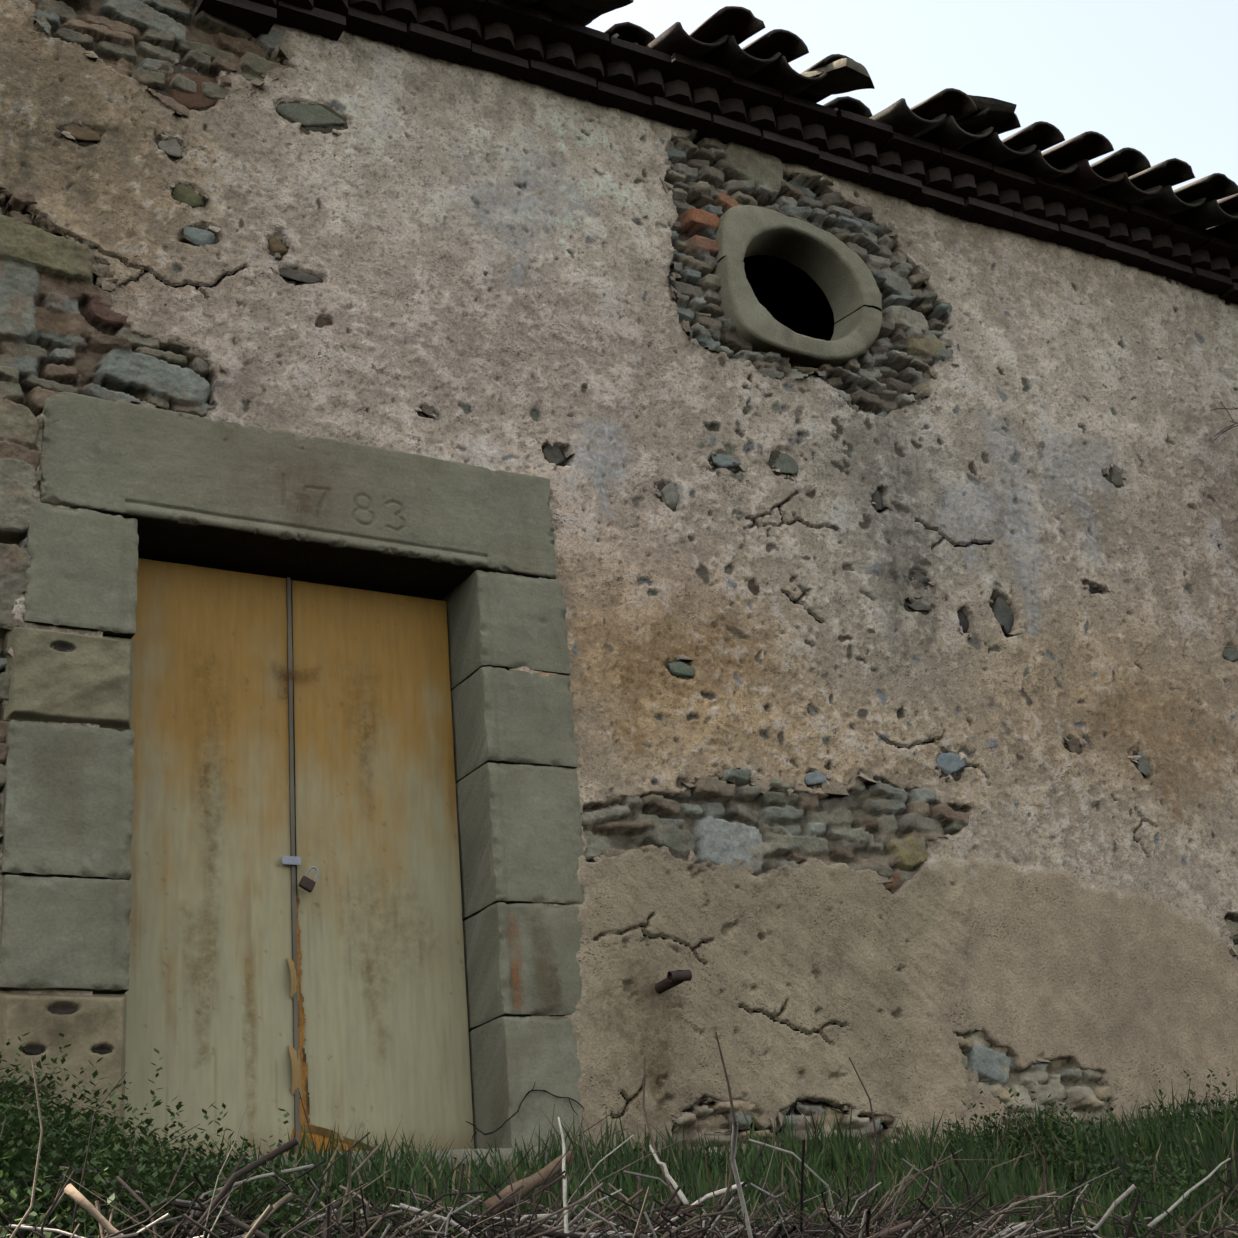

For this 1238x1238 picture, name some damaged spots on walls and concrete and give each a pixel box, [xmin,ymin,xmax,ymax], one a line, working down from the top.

flaking render [17,0,348,136]
crack [0,192,31,215]
flaking render [170,183,209,208]
crack [98,251,244,298]
flaking render [659,129,953,417]
flaking render [0,187,229,704]
crack [753,498,827,529]
crack [915,521,991,549]
flaking render [581,767,970,894]
crack [738,1006,843,1045]
spalling [953,1020,1118,1135]
peeling [671,1094,903,1173]